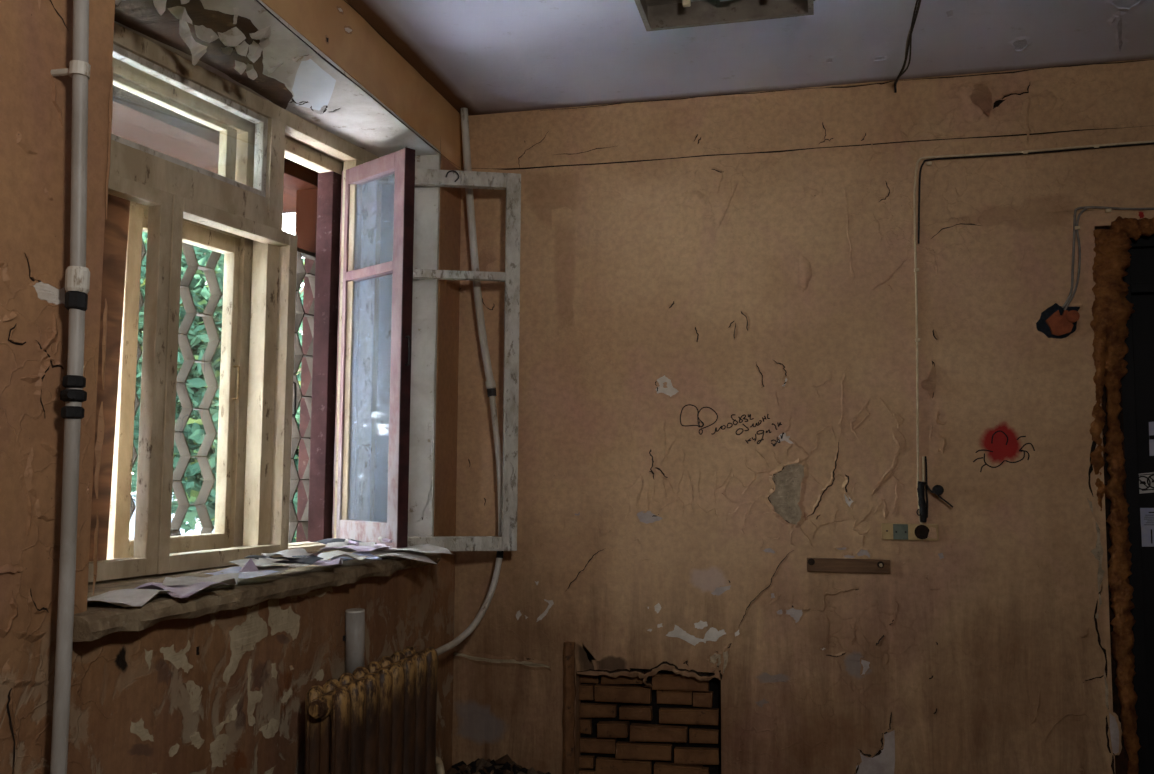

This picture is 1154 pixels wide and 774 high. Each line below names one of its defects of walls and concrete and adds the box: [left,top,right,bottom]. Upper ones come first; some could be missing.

peeling [114,0,341,115]
crack [668,301,699,342]
crack [728,311,751,339]
crack [0,252,64,536]
crack [648,450,668,480]
spalling [764,458,809,528]
crack [722,360,907,692]
crack [566,549,606,592]
spalling [577,600,741,686]
peeling [127,586,334,774]
peeling [854,728,897,774]